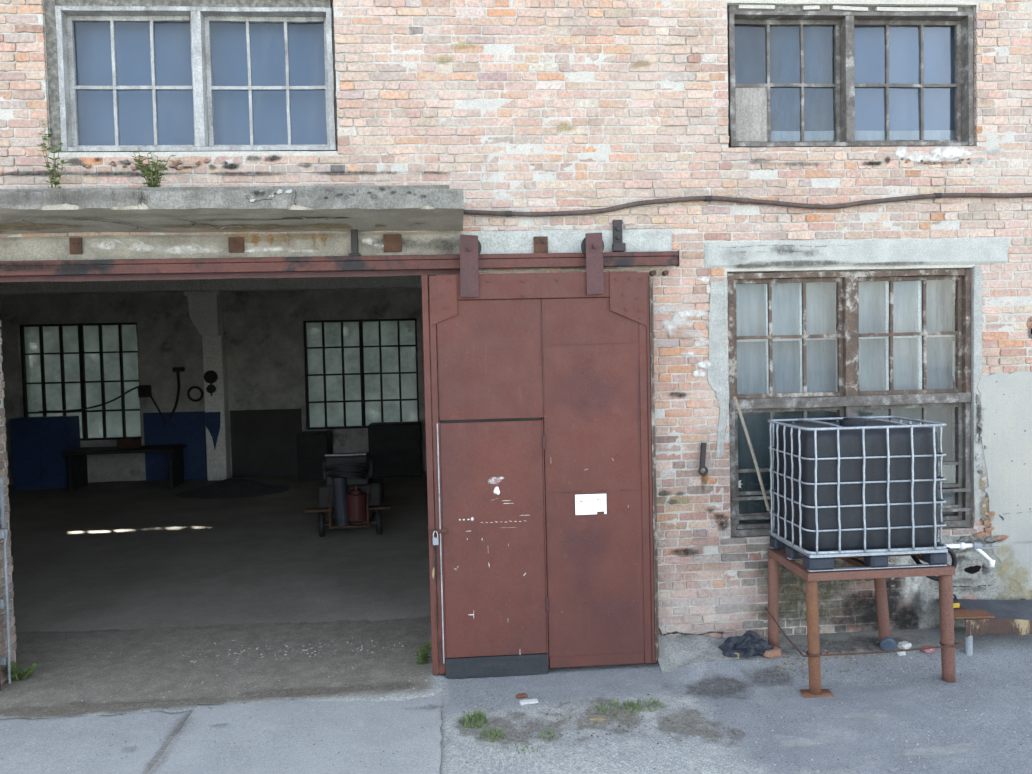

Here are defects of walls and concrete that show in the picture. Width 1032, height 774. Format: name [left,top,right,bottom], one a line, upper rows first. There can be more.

flaking render [953,394,1010,574]